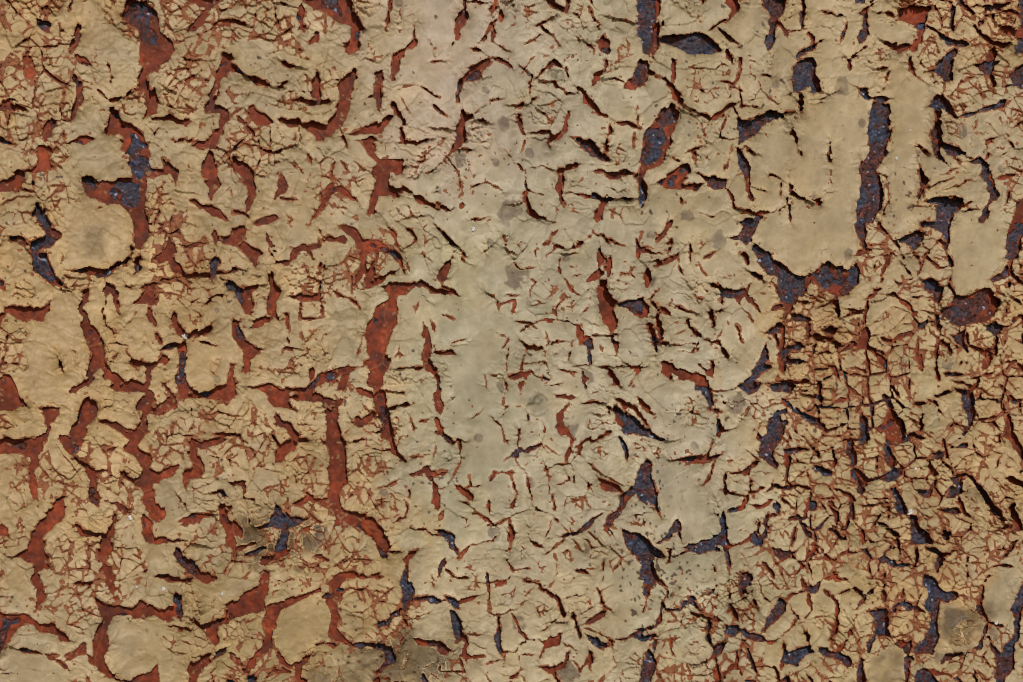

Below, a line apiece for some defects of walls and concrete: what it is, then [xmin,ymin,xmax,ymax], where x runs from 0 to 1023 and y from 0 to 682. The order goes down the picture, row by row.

crack [0,315,19,377]
crack [0,0,140,250]
peeling [68,19,165,182]
corrosion [68,0,182,228]
peeling [0,150,290,682]
peeling [576,356,740,573]
corrosion [568,97,797,217]
crack [368,0,1023,682]
peeling [586,0,1012,276]
corrosion [723,101,895,324]
corrosion [919,219,1023,330]
peeling [922,137,1023,296]